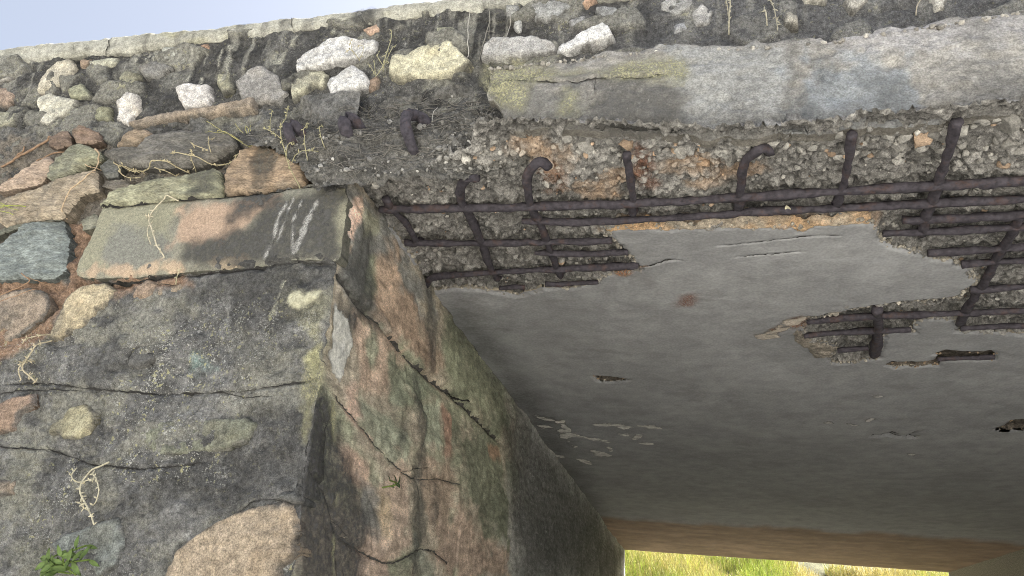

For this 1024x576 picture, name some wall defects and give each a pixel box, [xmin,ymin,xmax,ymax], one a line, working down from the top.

spalling [239,84,1024,369]
crack [736,235,839,257]
crack [111,261,497,442]
crack [1,355,326,398]
crack [0,446,207,470]
crack [335,395,460,485]
peeling [537,416,662,465]
spalling [997,419,1024,430]
crack [308,468,448,571]